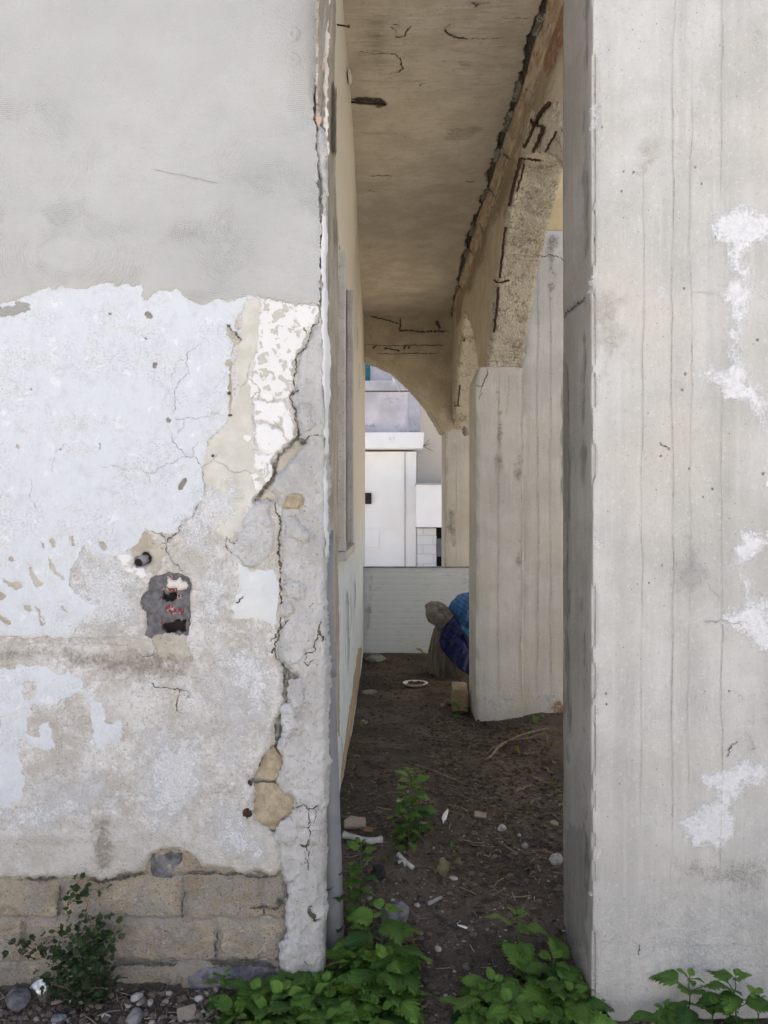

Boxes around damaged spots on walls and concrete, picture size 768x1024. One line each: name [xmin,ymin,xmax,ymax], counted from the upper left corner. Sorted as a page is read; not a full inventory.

spalling [451,0,563,333]
rust [456,6,563,325]
peeling [202,298,319,539]
crack [357,316,449,386]
leakage [699,204,768,424]
flaking render [99,531,168,578]
crack [105,317,356,745]
leakage [721,580,768,651]
leakage [733,530,768,565]
peeling [0,664,123,809]
crack [296,805,319,870]
leakage [679,759,767,851]